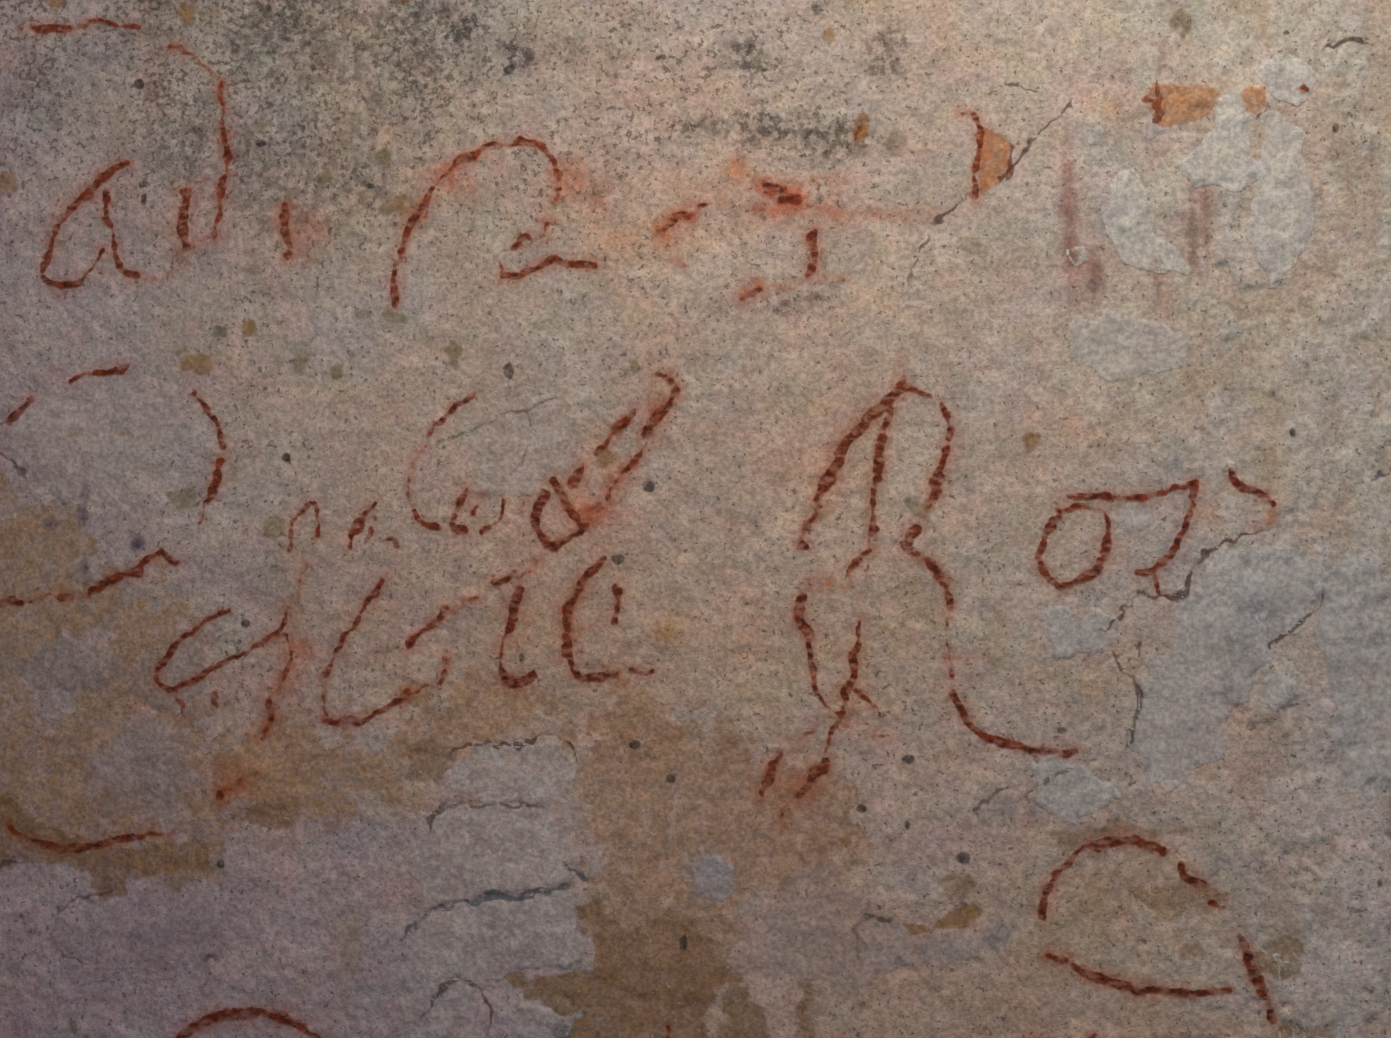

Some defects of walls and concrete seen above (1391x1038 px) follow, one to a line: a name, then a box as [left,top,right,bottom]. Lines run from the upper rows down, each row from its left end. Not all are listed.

flaking render [1066,246,1088,266]
flaking render [1102,169,1190,274]
flaking render [1174,54,1318,288]
crack [406,862,587,932]